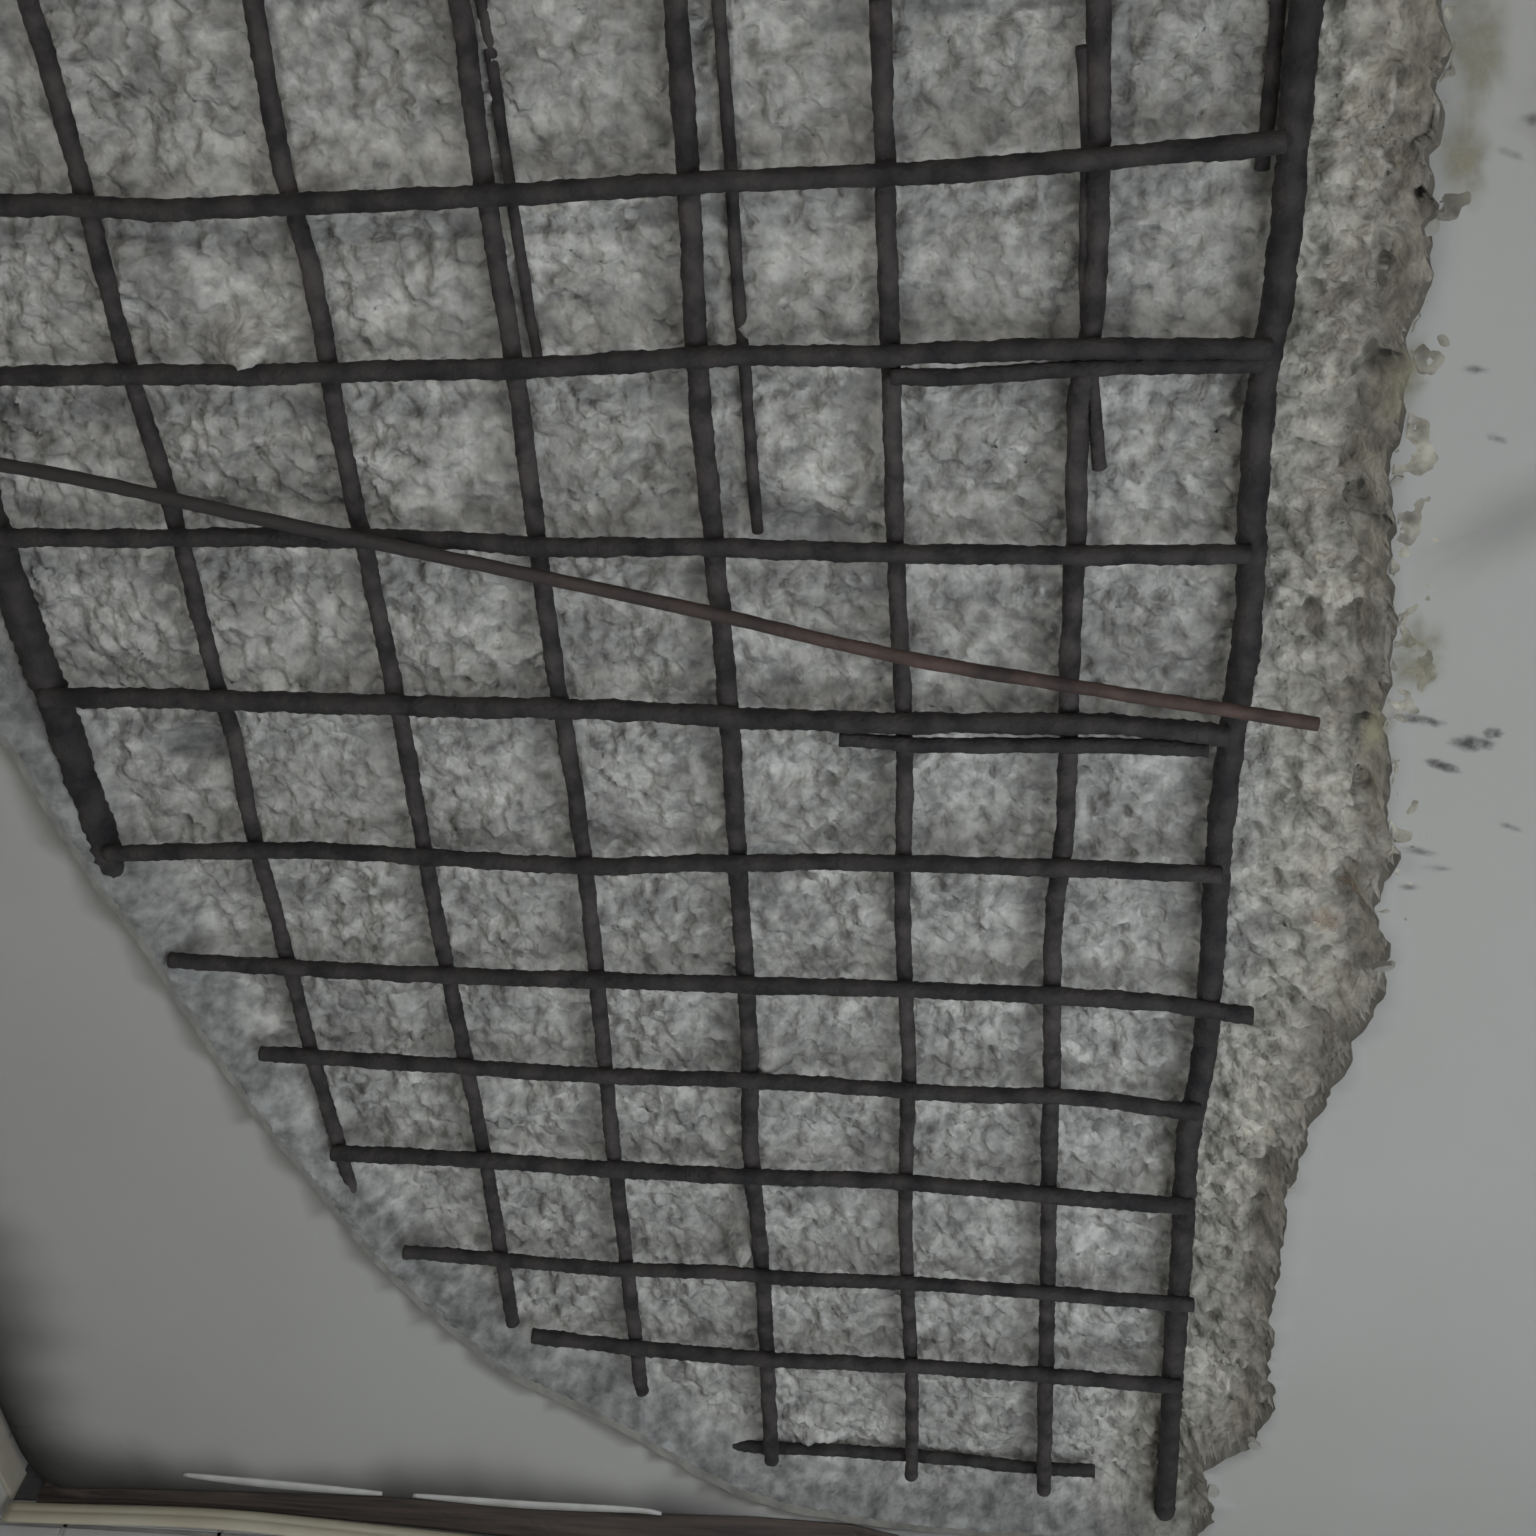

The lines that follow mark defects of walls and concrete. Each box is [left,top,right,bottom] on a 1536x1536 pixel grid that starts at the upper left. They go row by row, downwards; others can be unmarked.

spalling [0,0,473,199]
spalling [470,0,676,184]
spalling [688,0,1086,171]
spalling [1110,0,1290,147]
spalling [701,187,880,346]
spalling [896,172,1081,344]
spalling [1101,155,1276,339]
spalling [0,196,717,705]
spalling [709,360,1070,714]
spalling [1086,373,1250,545]
spalling [1175,0,1471,1536]
spalling [0,608,1195,1536]